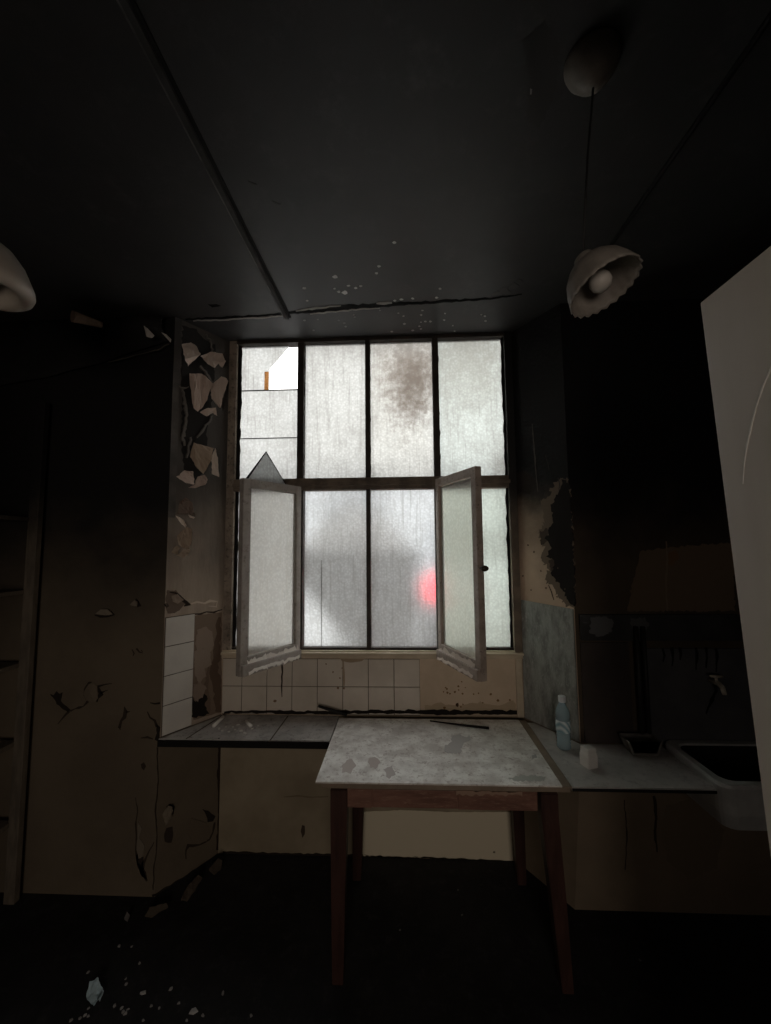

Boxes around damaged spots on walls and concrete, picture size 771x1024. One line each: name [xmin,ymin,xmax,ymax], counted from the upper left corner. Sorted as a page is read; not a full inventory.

crack [185,294,522,320]
flaking render [144,315,283,488]
flaking render [165,590,222,720]
crack [58,682,175,888]